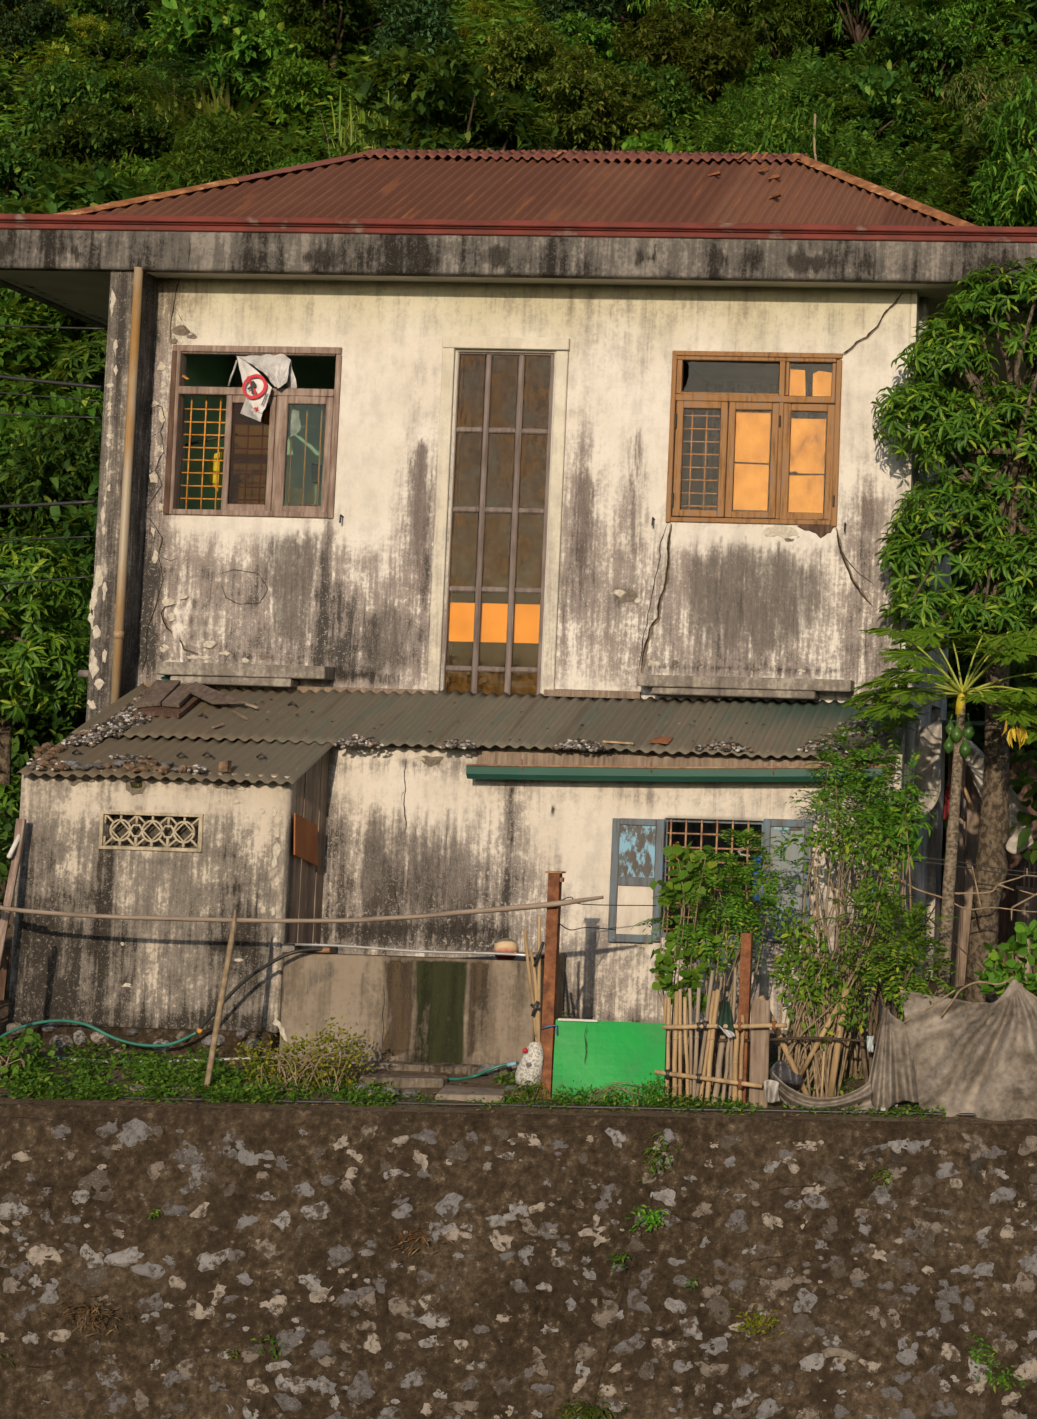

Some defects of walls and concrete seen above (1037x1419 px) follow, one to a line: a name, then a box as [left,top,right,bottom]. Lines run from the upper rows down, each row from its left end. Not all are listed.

leakage [489,245,507,270]
leakage [787,253,872,275]
crack [844,292,904,355]
leakage [412,444,428,588]
leakage [573,470,593,570]
leakage [269,522,329,639]
crack [638,523,672,672]
leakage [691,549,817,651]
crack [836,529,873,607]
leakage [336,610,397,682]
leakage [213,887,258,957]
leakage [330,919,509,939]